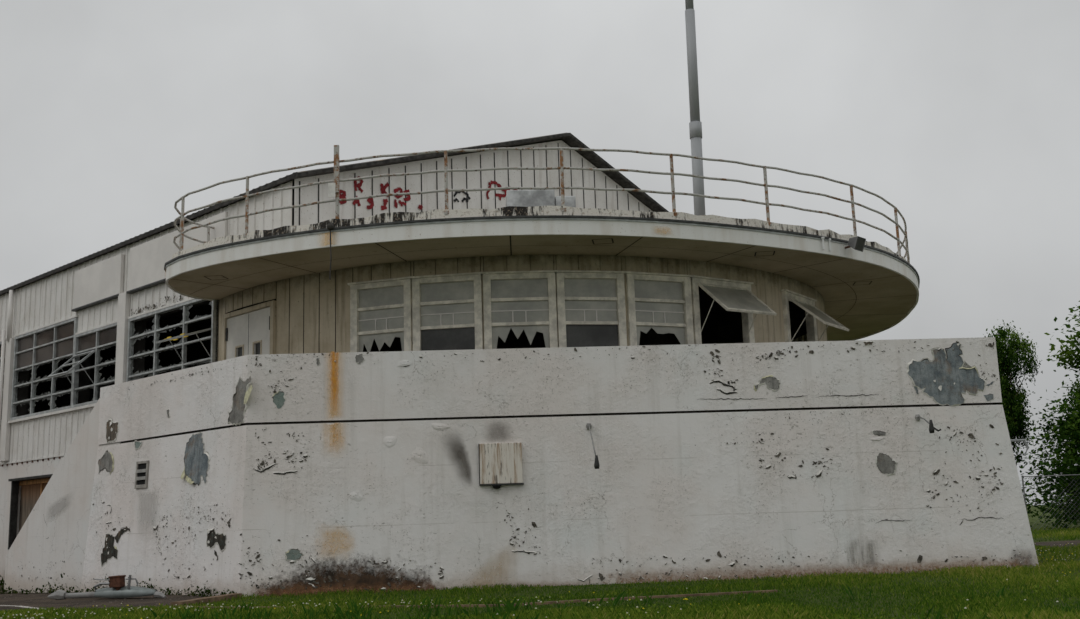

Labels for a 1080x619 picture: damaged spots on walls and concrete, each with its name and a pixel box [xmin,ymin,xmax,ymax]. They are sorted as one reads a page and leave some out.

peeling [228,353,336,425]
peeling [688,343,824,392]
peeling [906,341,998,407]
peeling [98,417,119,475]
peeling [181,432,210,486]
peeling [255,428,310,471]
spalling [875,453,898,476]
peeling [92,504,130,583]
peeling [152,504,350,594]
peeling [362,559,444,592]